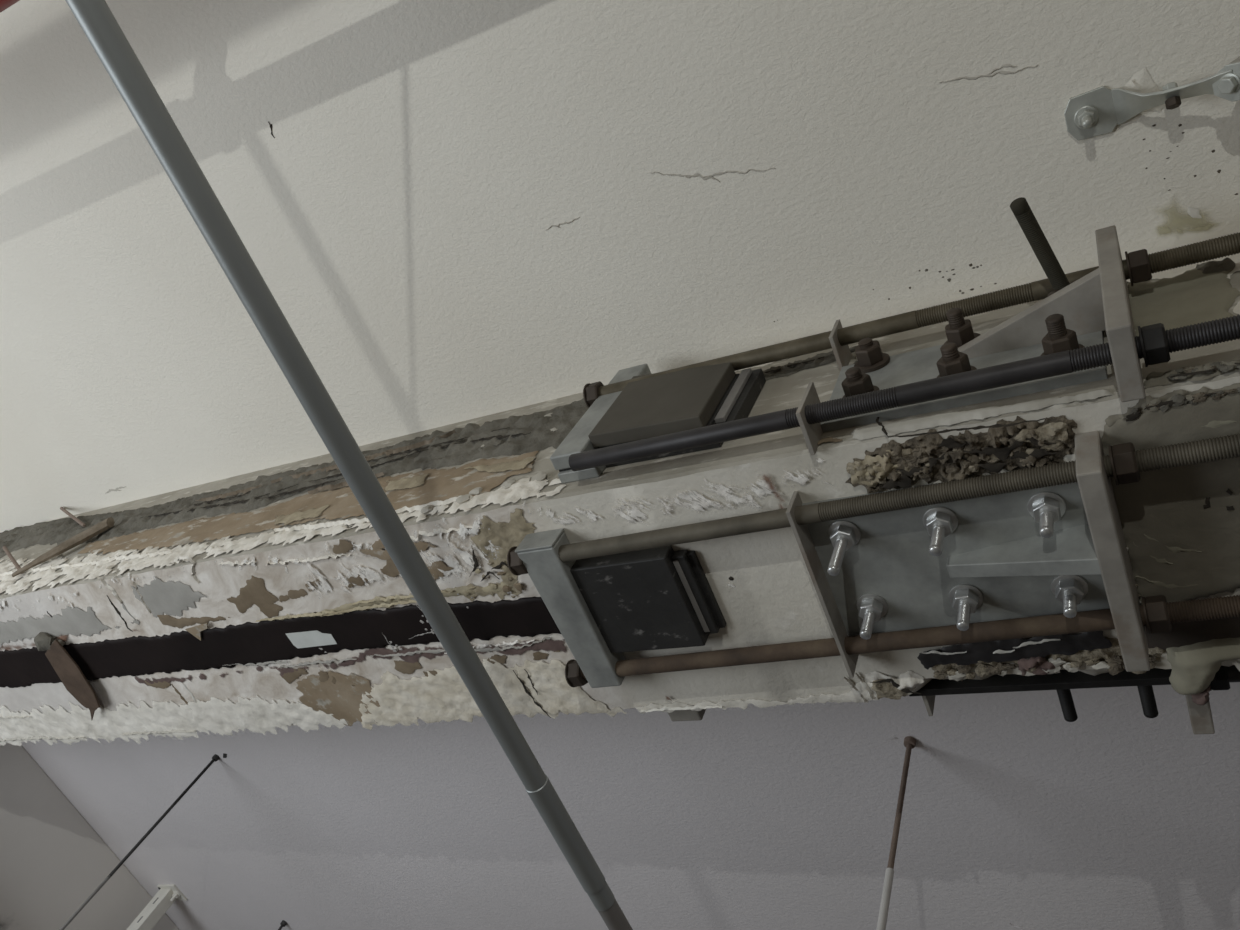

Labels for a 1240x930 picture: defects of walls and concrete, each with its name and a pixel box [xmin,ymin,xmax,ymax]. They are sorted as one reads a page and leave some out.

crack [940,64,1037,83]
crack [657,168,775,182]
leakage [1159,207,1212,234]
spalling [362,398,589,514]
spalling [845,415,1077,494]
spalling [0,460,366,558]
peeling [462,508,536,602]
peeling [279,579,321,602]
peeling [157,615,230,641]
peeling [359,666,484,730]
peeling [483,658,627,719]
spalling [867,631,1166,700]